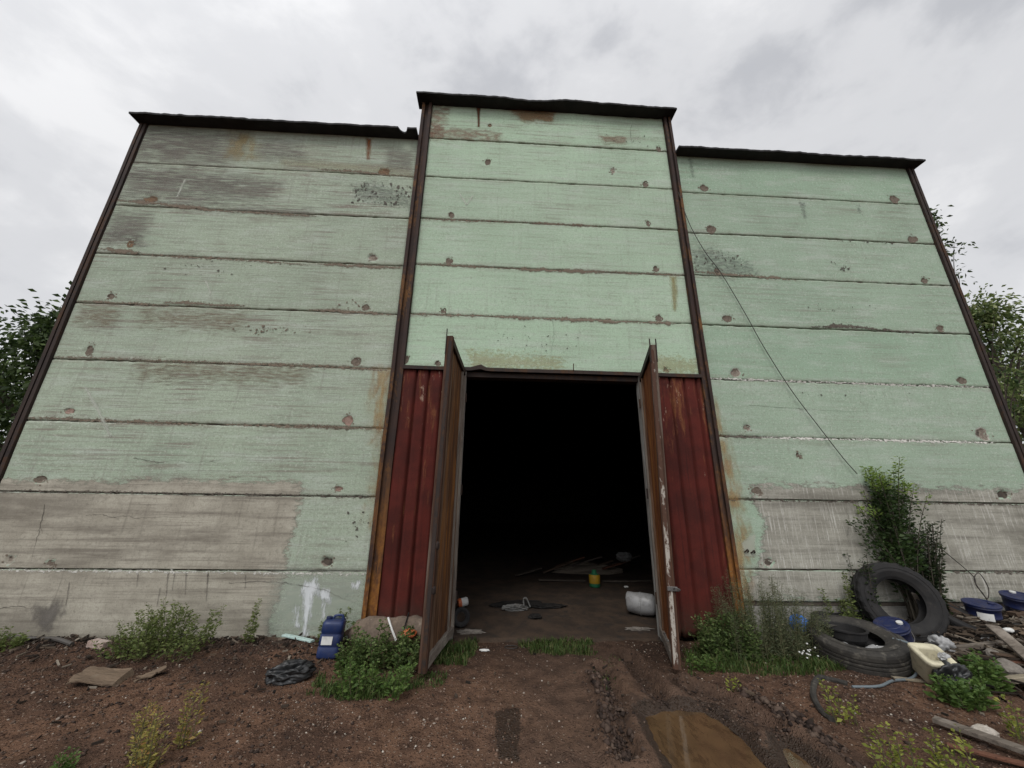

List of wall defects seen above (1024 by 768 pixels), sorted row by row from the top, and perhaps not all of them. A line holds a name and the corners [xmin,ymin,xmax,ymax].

corrosion [430,108,498,139]
corrosion [512,110,553,121]
peeling [729,481,1024,602]
peeling [0,476,371,639]
leakage [317,589,330,617]